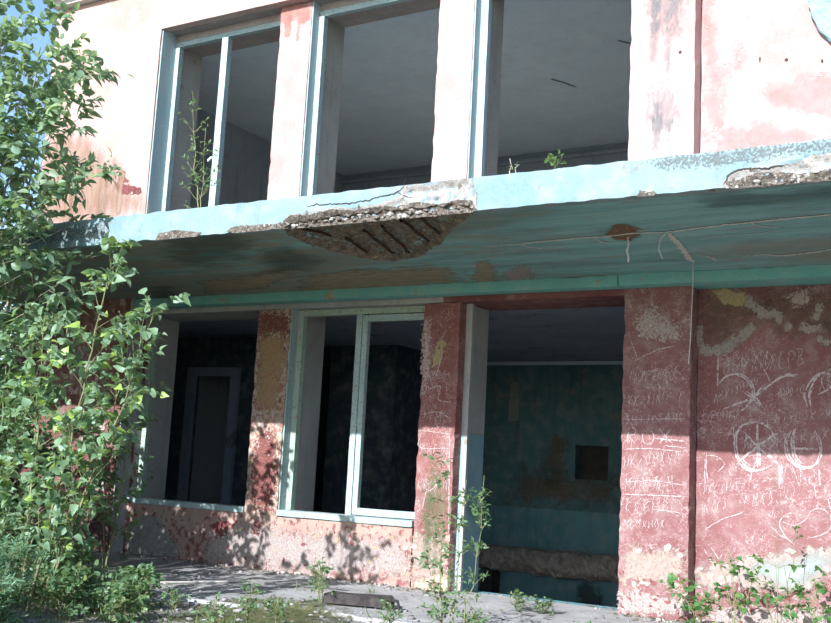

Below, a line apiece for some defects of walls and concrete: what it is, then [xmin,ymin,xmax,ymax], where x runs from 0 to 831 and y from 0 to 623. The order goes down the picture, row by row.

peeling [115,176,141,195]
crack [308,178,413,207]
spalling [723,152,831,189]
spalling [227,178,535,292]
rust [607,224,644,241]
crack [486,214,831,262]
peeling [712,288,747,307]
peeling [786,289,811,308]
peeling [253,311,290,414]
peeling [199,427,448,584]
peeling [617,541,831,623]